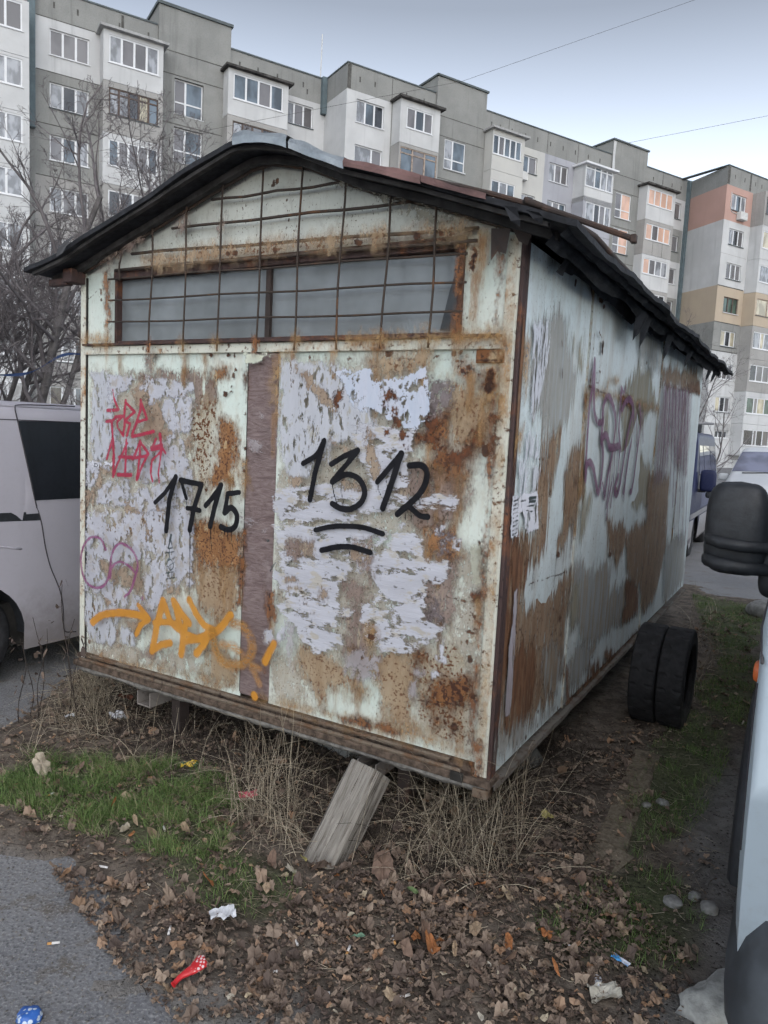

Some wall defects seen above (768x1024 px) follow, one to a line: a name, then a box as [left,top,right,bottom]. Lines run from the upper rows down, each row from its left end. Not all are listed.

corrosion [81,220,391,345]
corrosion [251,335,260,354]
corrosion [280,216,701,778]
corrosion [189,517,247,624]